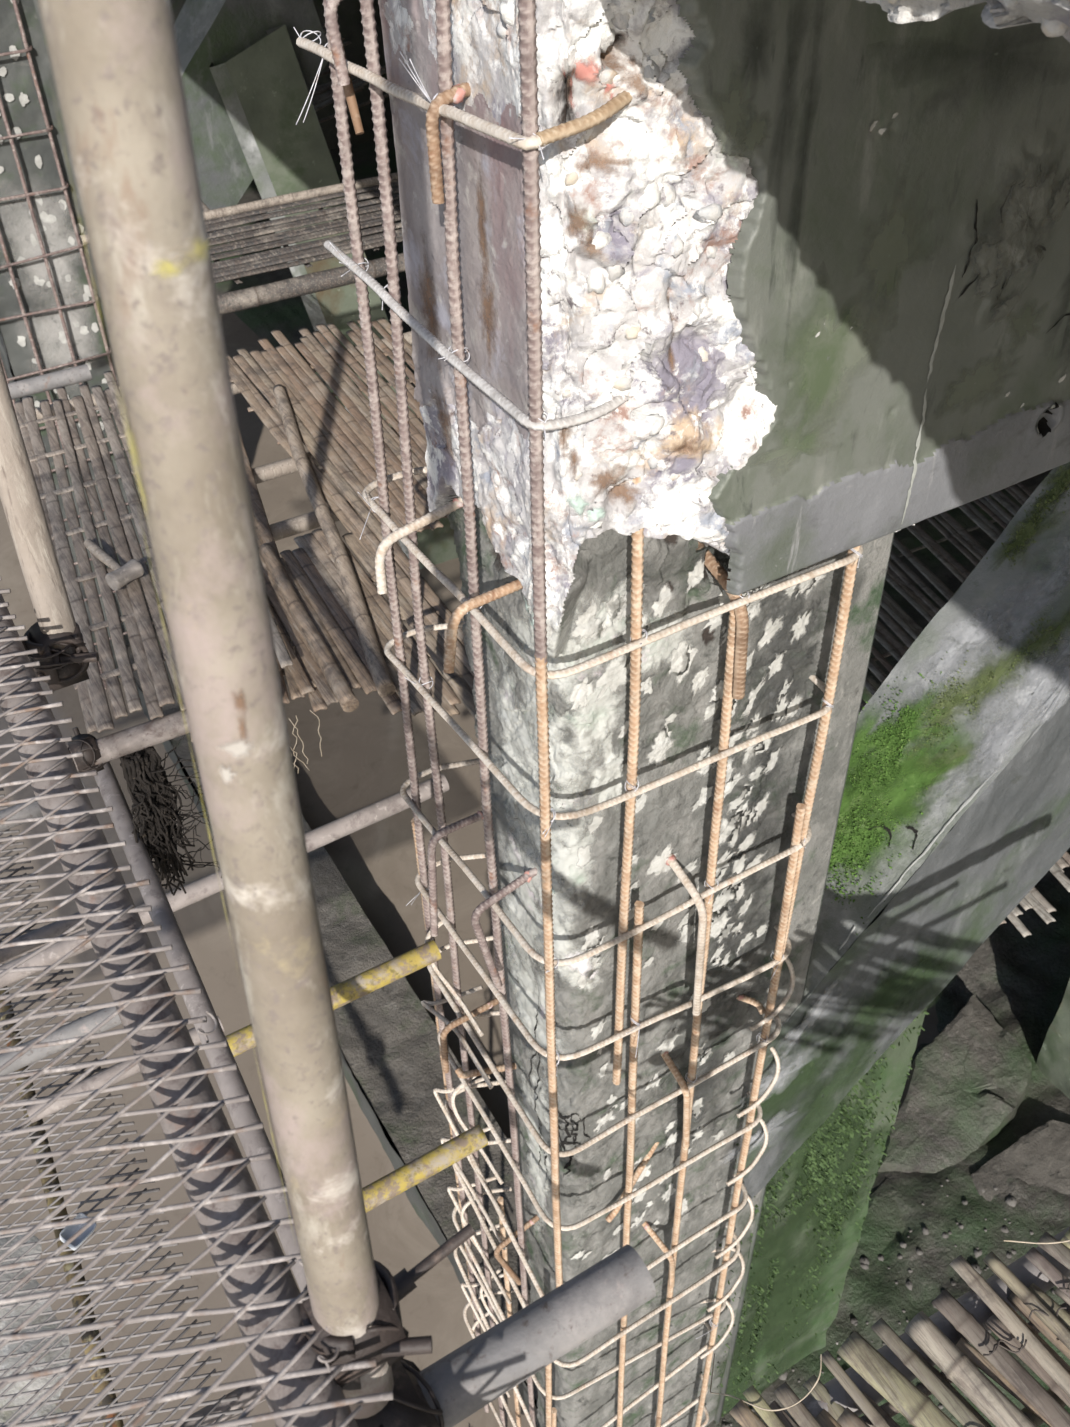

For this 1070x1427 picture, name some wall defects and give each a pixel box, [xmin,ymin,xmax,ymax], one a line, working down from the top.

spalling [859,0,1070,42]
spalling [382,0,824,969]
damp [906,572,1070,748]
spalling [976,647,1070,776]
spalling [568,927,605,989]
spalling [591,1020,608,1077]
spalling [645,1072,661,1090]
spalling [657,1028,679,1055]
spalling [697,1043,735,1065]
spalling [571,1094,724,1260]
damp [720,952,944,1414]